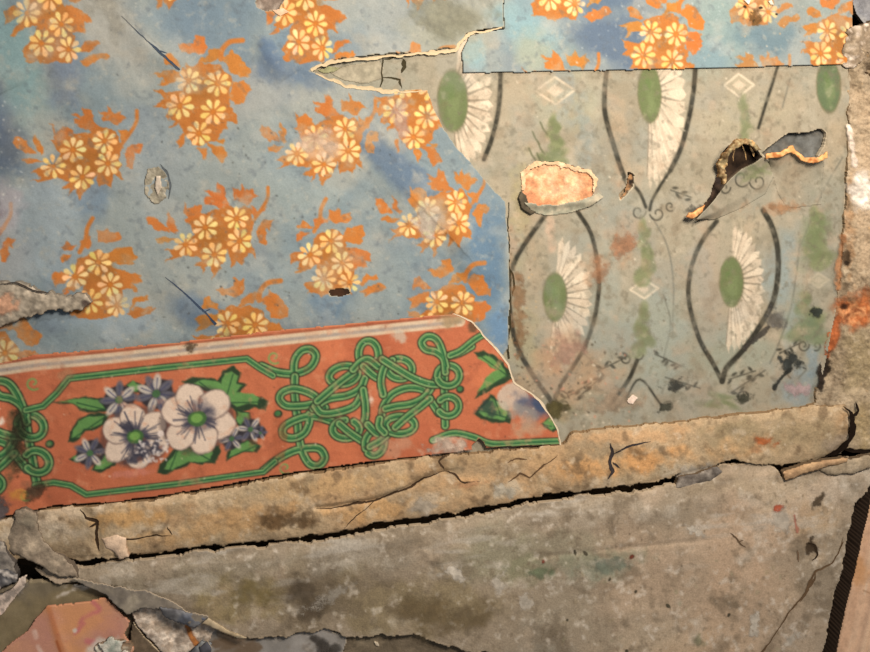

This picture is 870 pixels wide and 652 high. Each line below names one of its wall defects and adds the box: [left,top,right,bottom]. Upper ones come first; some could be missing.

spalling [841,0,870,69]
spalling [518,161,603,215]
peeling [686,138,828,220]
peeling [0,280,93,327]
rust [825,235,870,358]
crack [80,509,100,551]
crack [126,527,172,540]
peeling [73,577,247,652]
flaking render [343,633,465,652]
crack [761,539,844,652]